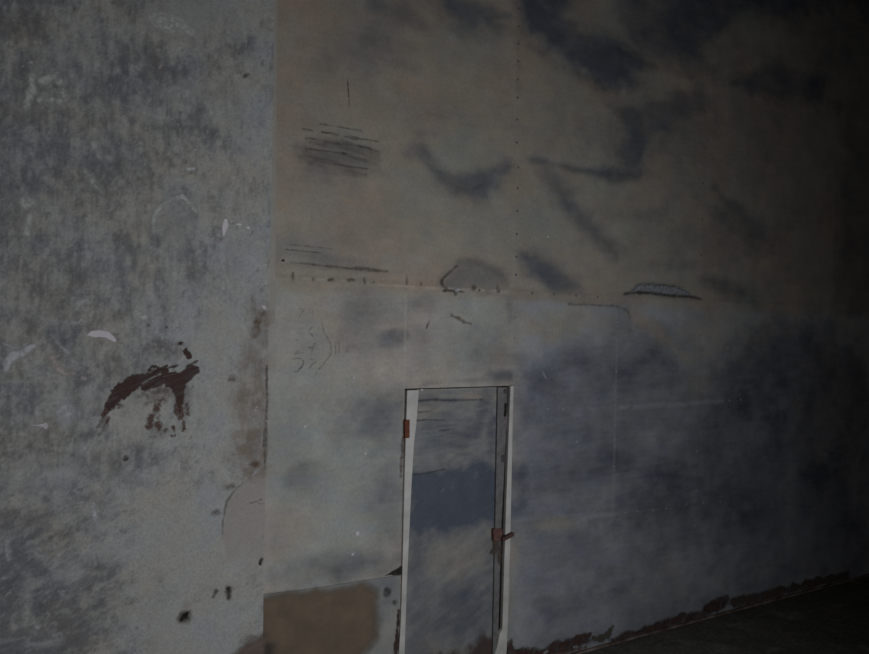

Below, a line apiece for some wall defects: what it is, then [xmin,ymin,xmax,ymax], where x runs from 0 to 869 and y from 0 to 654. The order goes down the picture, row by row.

corrosion [101,342,200,437]
corrosion [263,583,378,654]